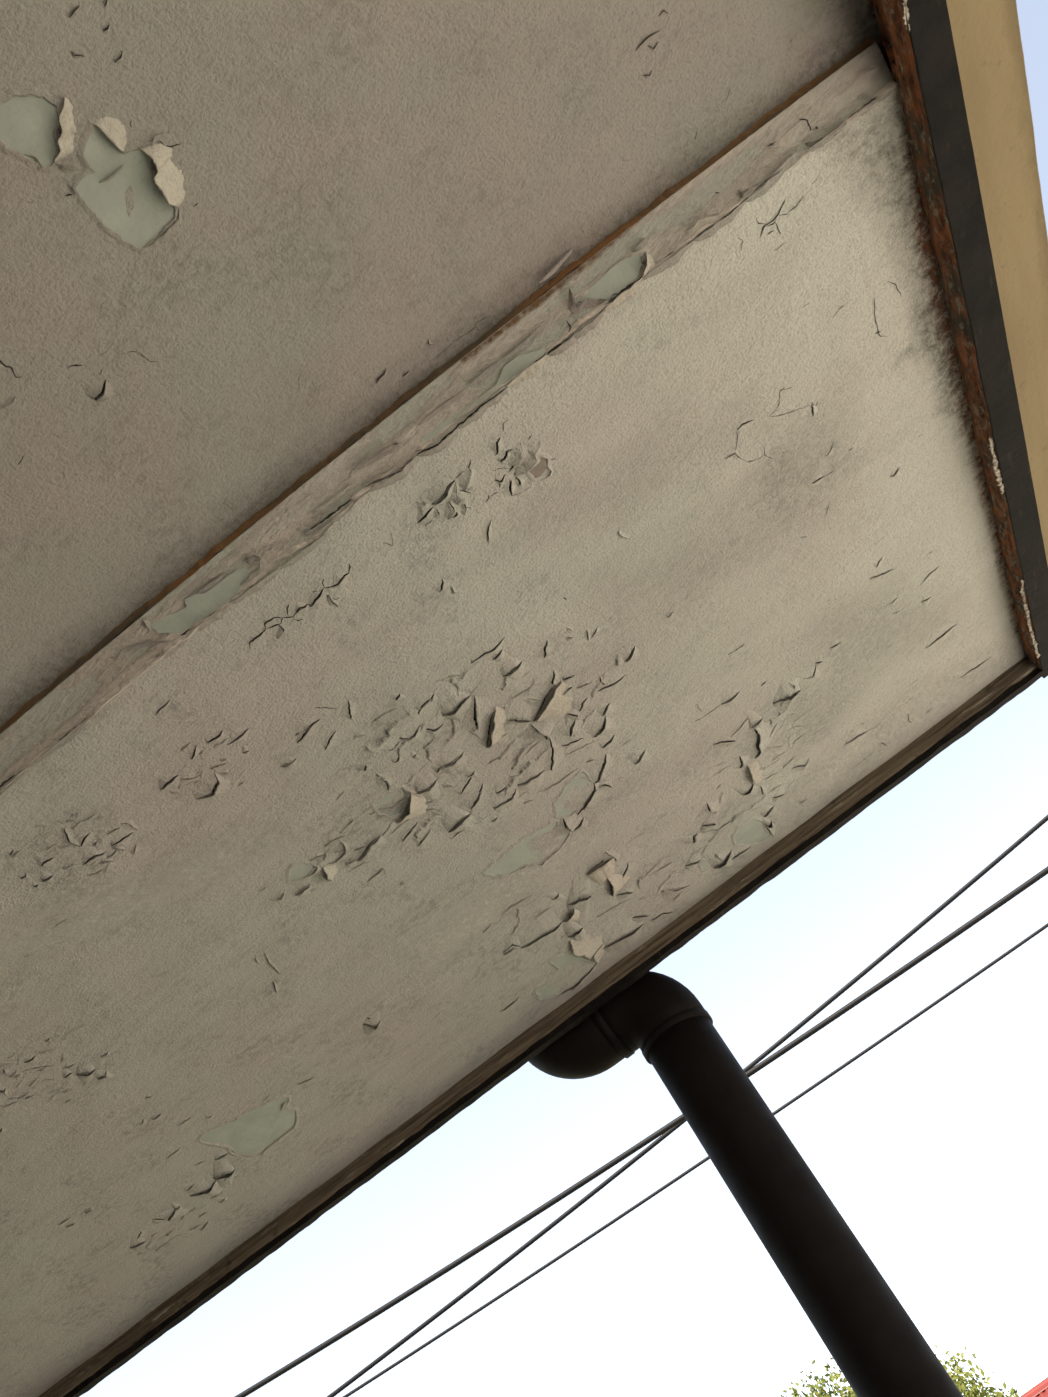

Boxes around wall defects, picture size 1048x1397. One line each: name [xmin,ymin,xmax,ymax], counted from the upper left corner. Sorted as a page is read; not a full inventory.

peeling [0,86,198,254]
peeling [116,92,891,662]
rust [903,117,1019,632]
crack [725,386,853,538]
peeling [6,812,139,890]
peeling [259,626,651,903]
peeling [481,638,840,1011]
peeling [0,1037,114,1146]
peeling [130,1150,241,1255]